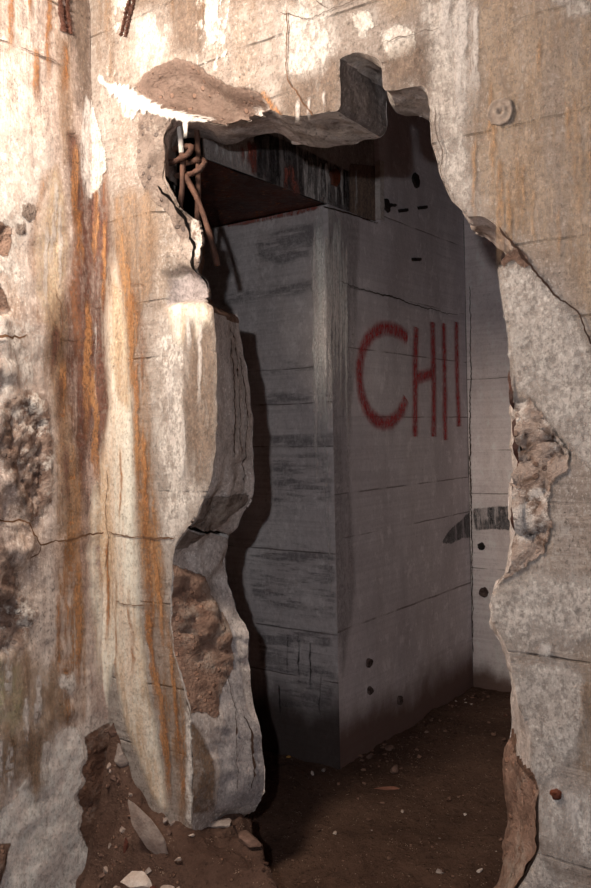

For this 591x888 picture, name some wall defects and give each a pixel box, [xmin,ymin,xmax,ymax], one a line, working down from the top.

spalling [0,390,56,524]
crack [0,472,174,567]
corrosion [46,134,189,820]
damp [32,0,213,198]
crack [158,186,208,292]
damp [155,272,216,551]
spalling [170,291,260,830]
spalling [133,0,430,275]
damp [278,0,339,117]
damp [352,0,591,306]
spalling [489,398,569,888]
crack [499,227,591,344]